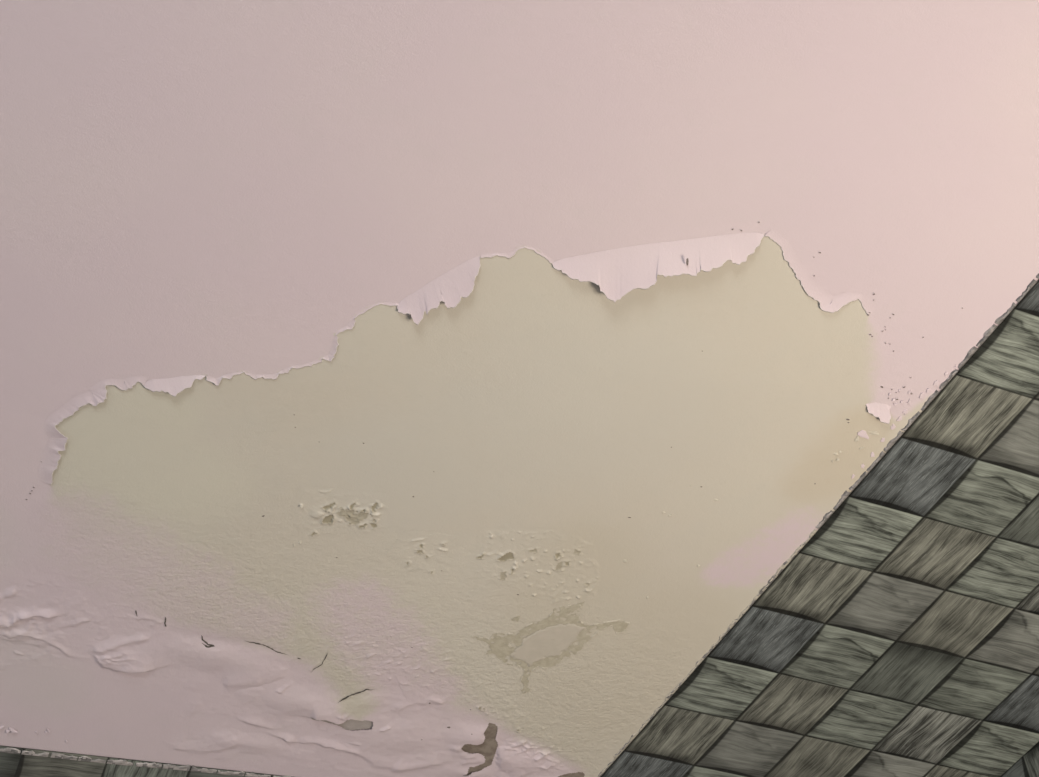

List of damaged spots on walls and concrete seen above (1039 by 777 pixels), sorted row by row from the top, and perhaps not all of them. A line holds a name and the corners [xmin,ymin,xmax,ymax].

water stain [46,269,916,777]
peeling [25,221,958,500]